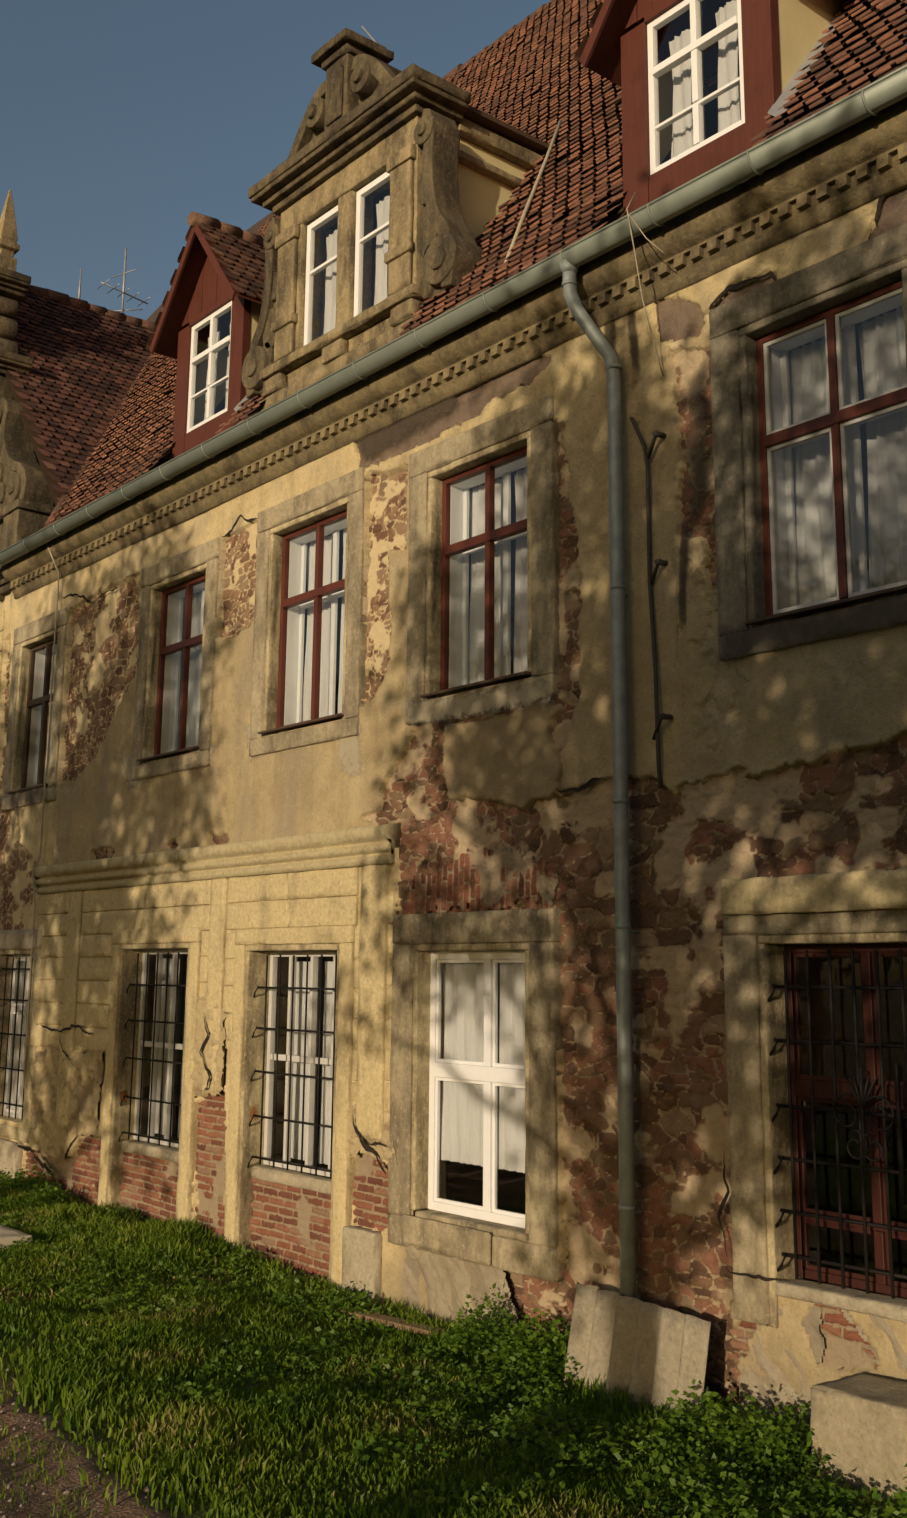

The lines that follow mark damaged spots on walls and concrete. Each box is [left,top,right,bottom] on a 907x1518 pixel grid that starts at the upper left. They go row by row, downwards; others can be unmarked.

spalling [868,188,907,239]
spalling [0,639,38,930]
spalling [63,575,140,781]
spalling [221,522,258,638]
spalling [357,356,551,703]
spalling [365,425,907,1412]
peeling [656,274,778,755]
flaking render [348,1104,397,1231]